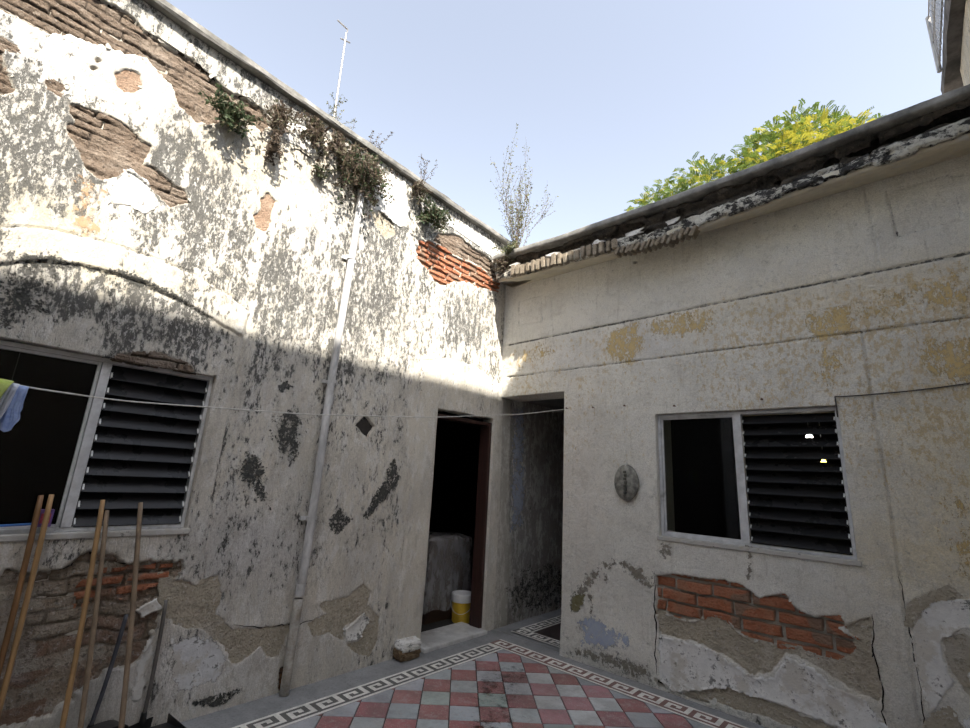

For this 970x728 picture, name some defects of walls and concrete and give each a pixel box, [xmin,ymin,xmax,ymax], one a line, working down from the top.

peeling [0,0,268,133]
peeling [45,79,191,214]
water stain [0,251,194,333]
water stain [349,275,434,391]
flaking render [416,218,502,292]
water stain [238,451,271,510]
water stain [269,409,307,469]
water stain [329,459,401,534]
flaking render [0,552,290,728]
peeling [656,574,888,728]
crack [871,618,887,726]
crack [898,577,925,725]